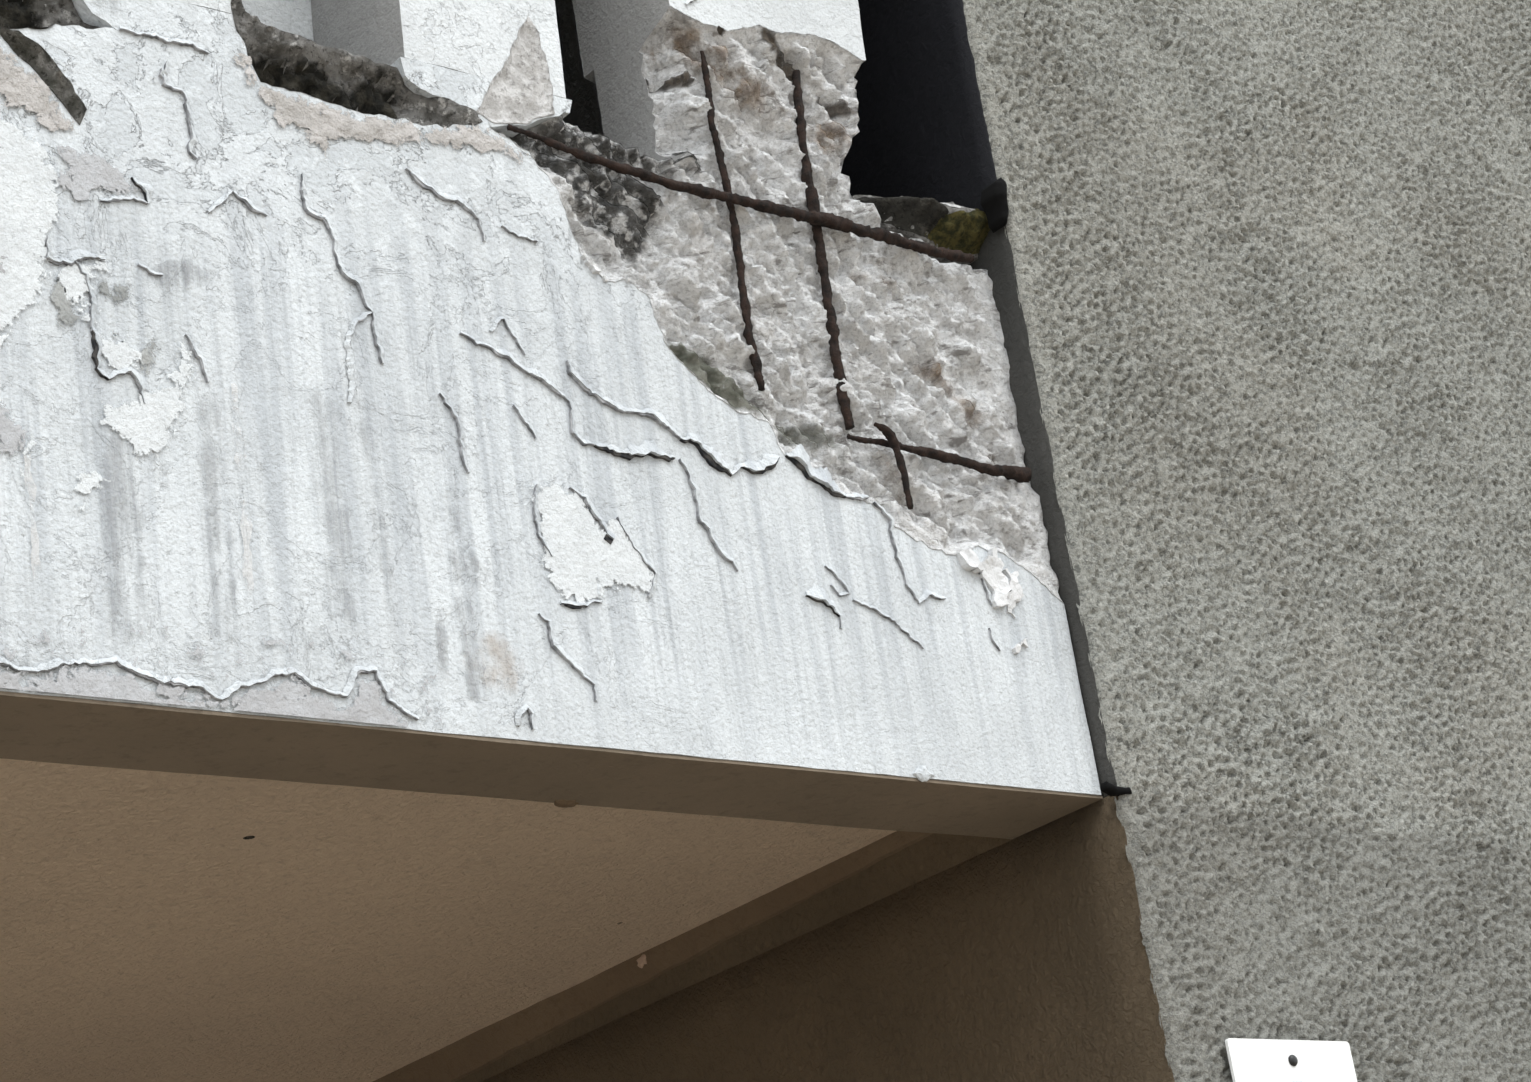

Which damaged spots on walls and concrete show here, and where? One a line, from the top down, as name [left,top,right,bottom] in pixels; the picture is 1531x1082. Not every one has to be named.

crack [119,26,209,160]
peeling [0,0,196,457]
crack [45,235,163,403]
crack [207,173,385,404]
spalling [231,0,1063,619]
rust [507,29,1032,510]
peeling [0,402,39,477]
peeling [70,470,111,512]
crack [0,655,419,721]
peeling [0,609,442,727]
crack [532,484,658,702]
crack [459,316,946,649]